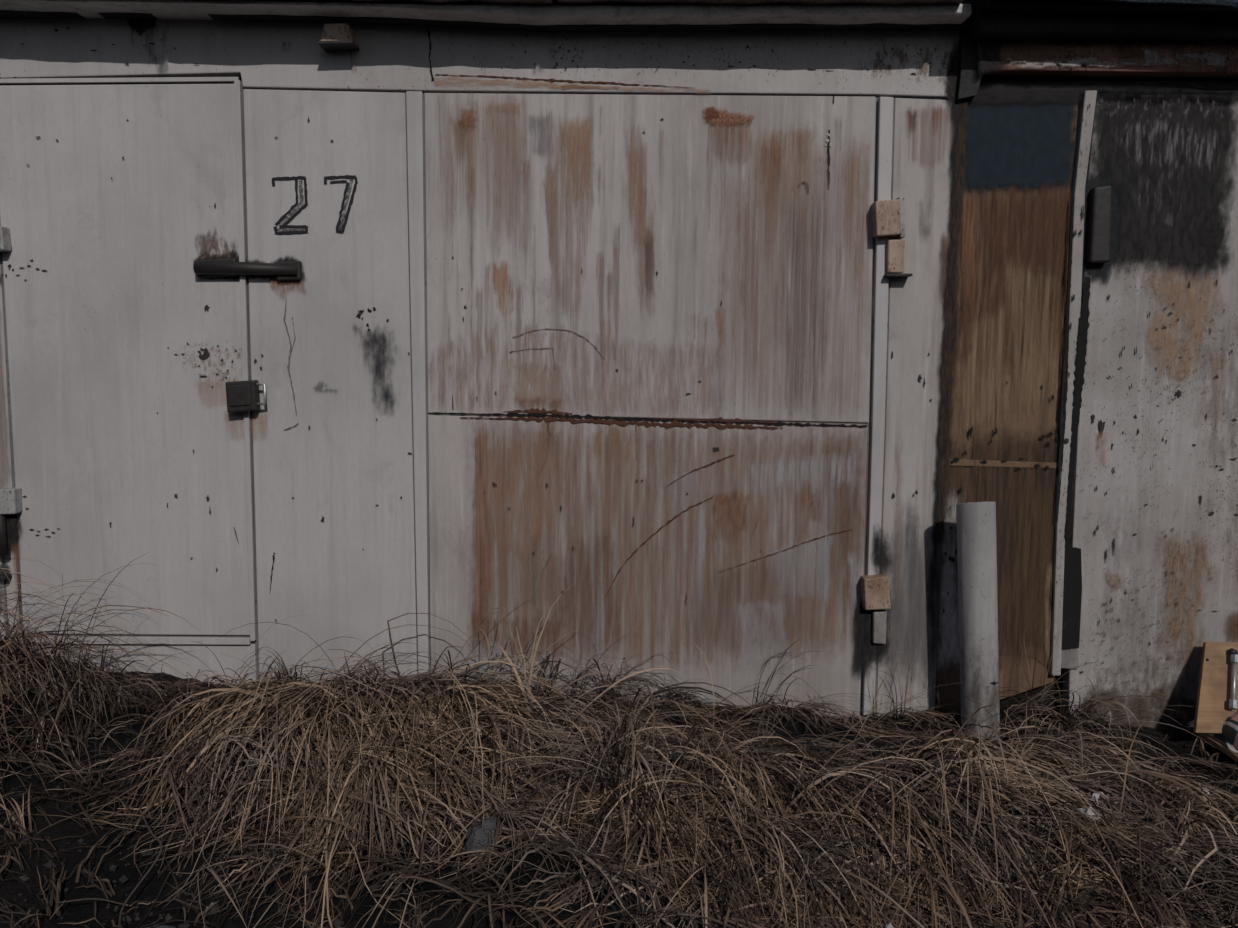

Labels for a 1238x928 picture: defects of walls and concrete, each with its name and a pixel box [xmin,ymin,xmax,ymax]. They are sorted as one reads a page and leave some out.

corrosion [704,106,753,126]
corrosion [530,117,591,290]
corrosion [949,426,1061,659]